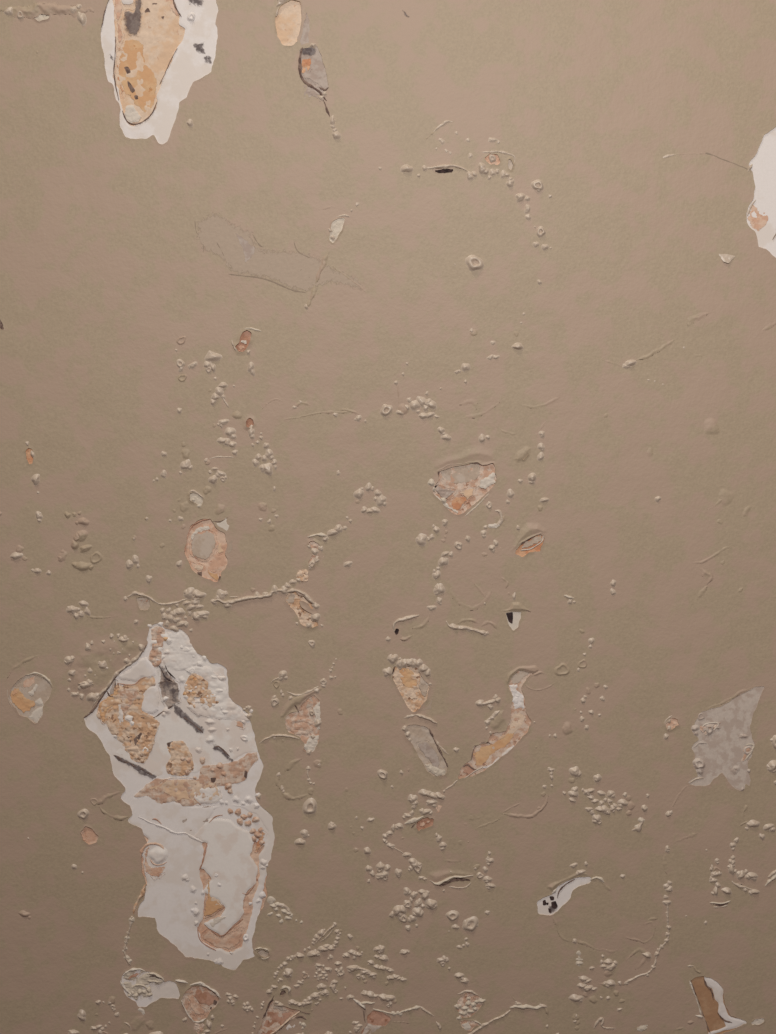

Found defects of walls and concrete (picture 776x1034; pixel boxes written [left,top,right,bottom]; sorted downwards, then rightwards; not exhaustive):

peeling [98,0,221,147]
peeling [272,0,341,140]
peeling [744,124,776,261]
peeling [428,445,500,518]
peeling [176,516,233,585]
peeling [6,655,55,726]
peeling [81,621,277,973]
peeling [382,654,556,854]
peeling [662,684,767,794]
peeling [535,861,612,918]
peeling [119,967,229,1034]
peeling [687,965,766,1034]